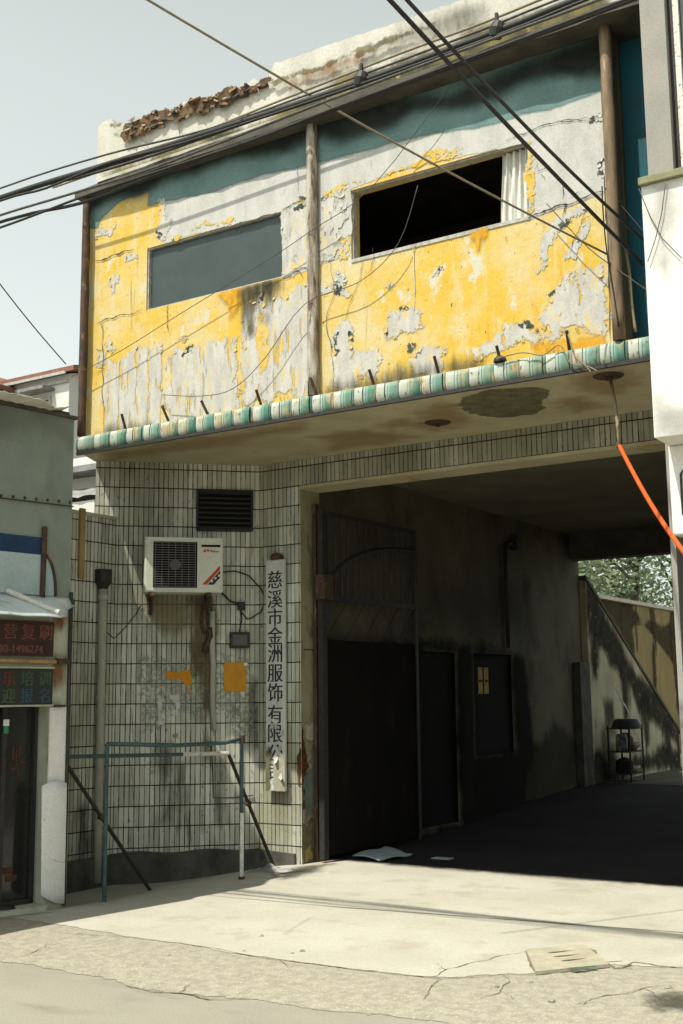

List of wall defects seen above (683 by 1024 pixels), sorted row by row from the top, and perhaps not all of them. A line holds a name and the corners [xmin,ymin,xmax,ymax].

spalling [120,76,274,142]
peeling [385,147,463,175]
peeling [94,180,369,431]
damp [237,278,279,334]
peeling [330,305,448,391]
peeling [471,201,612,363]
crack [211,895,675,1004]